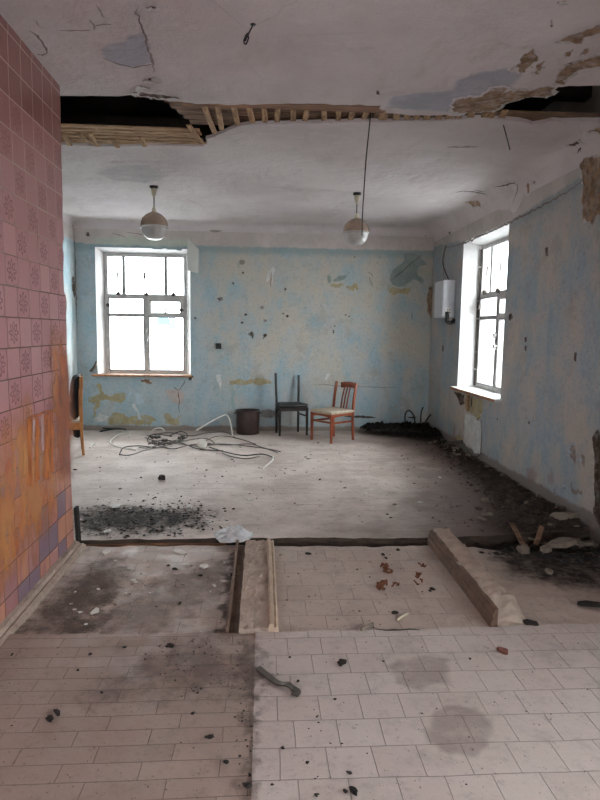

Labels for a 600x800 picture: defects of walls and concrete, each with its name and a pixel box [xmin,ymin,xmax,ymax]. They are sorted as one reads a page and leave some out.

peeling [96,29,156,69]
crack [104,8,178,100]
spalling [447,23,600,114]
spalling [579,154,600,231]
peeling [385,251,433,320]
peeling [87,380,182,428]
peeling [228,377,273,388]
corrosion [0,342,71,568]